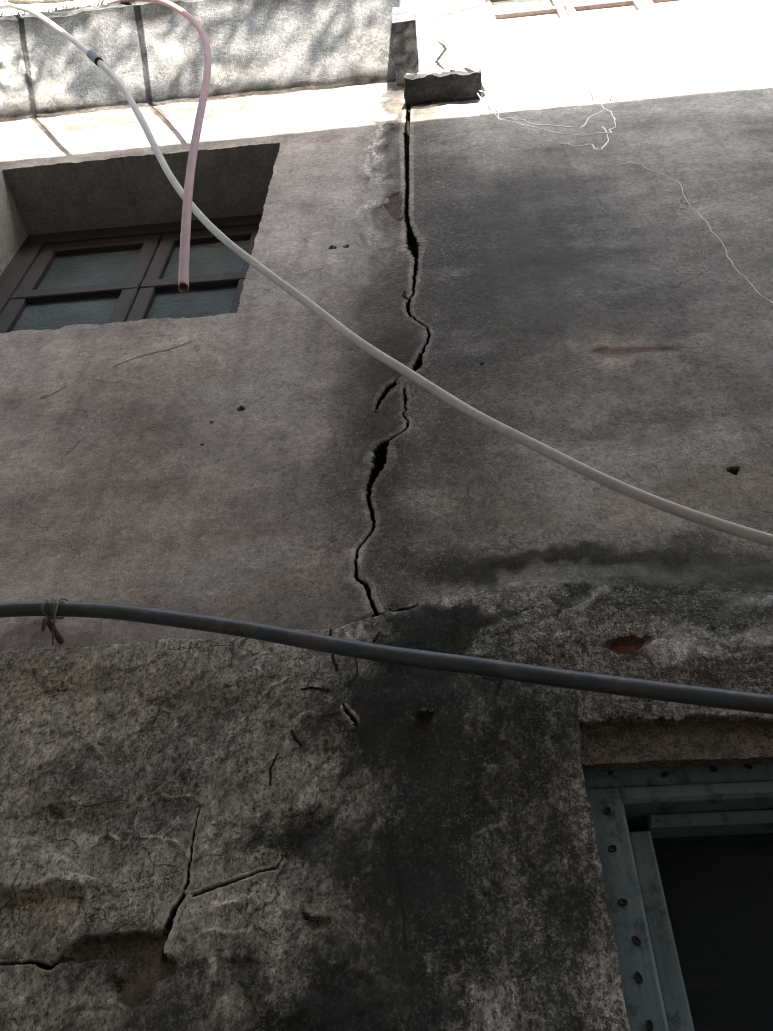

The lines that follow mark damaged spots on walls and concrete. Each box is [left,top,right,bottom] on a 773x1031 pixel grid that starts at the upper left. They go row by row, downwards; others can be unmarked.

crack [435,41,486,97]
crack [301,103,435,726]
damp [378,604,528,655]
crack [268,730,302,786]
damp [250,662,507,1031]
crack [155,807,287,961]
crack [0,953,66,974]